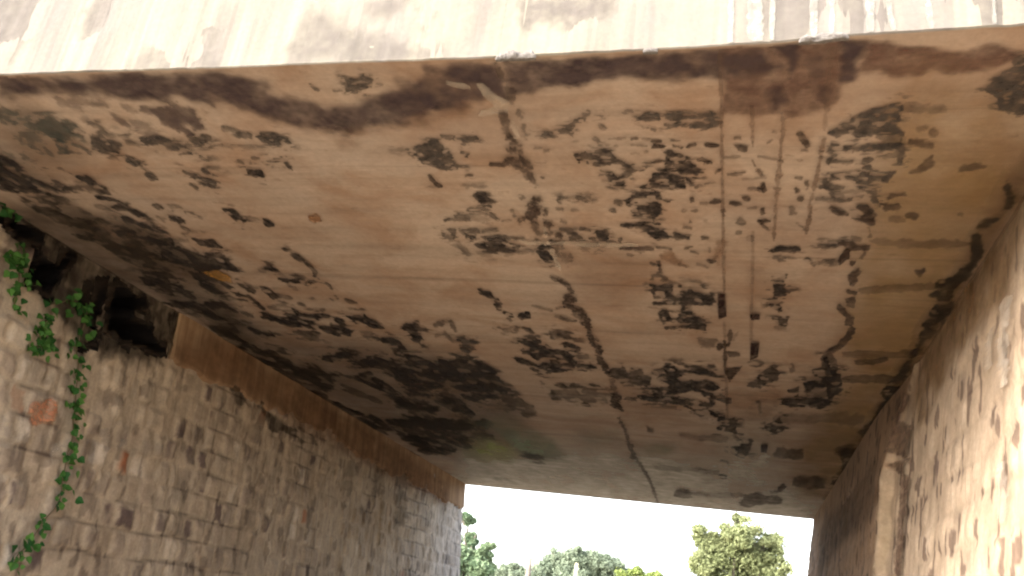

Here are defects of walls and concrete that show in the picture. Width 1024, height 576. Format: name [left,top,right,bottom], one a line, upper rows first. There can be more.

water stain [0,0,774,136]
crack [428,63,564,249]
crack [478,277,658,502]
water stain [209,184,1024,518]